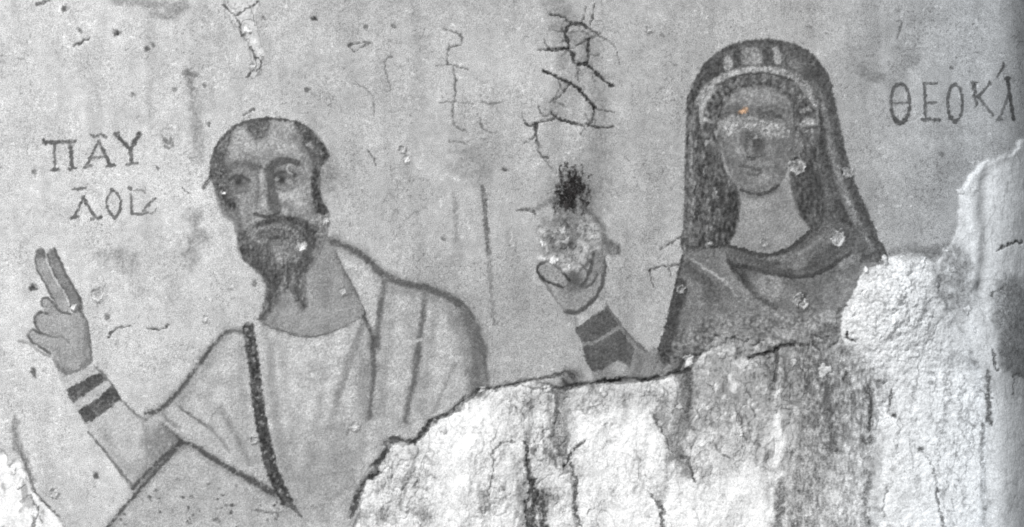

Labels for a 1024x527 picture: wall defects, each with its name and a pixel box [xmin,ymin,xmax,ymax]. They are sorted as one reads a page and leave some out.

crack [523,5,613,158]
peeling [788,160,806,174]
spalling [536,214,603,271]
peeling [831,231,844,246]
peeling [793,292,808,309]
spalling [936,138,1024,527]
spalling [354,335,896,527]